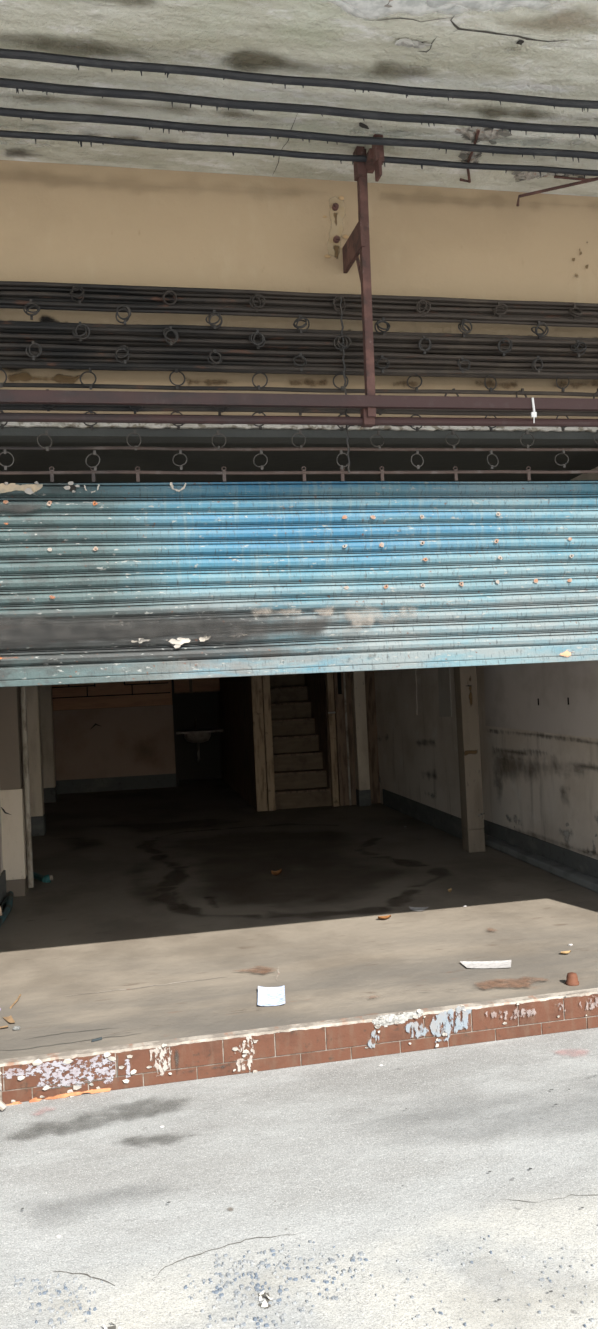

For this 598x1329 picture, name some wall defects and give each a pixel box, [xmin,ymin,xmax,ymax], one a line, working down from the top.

spalling [512,171,598,206]
peeling [365,1003,536,1049]
peeling [0,1044,172,1106]
peeling [232,1035,258,1073]